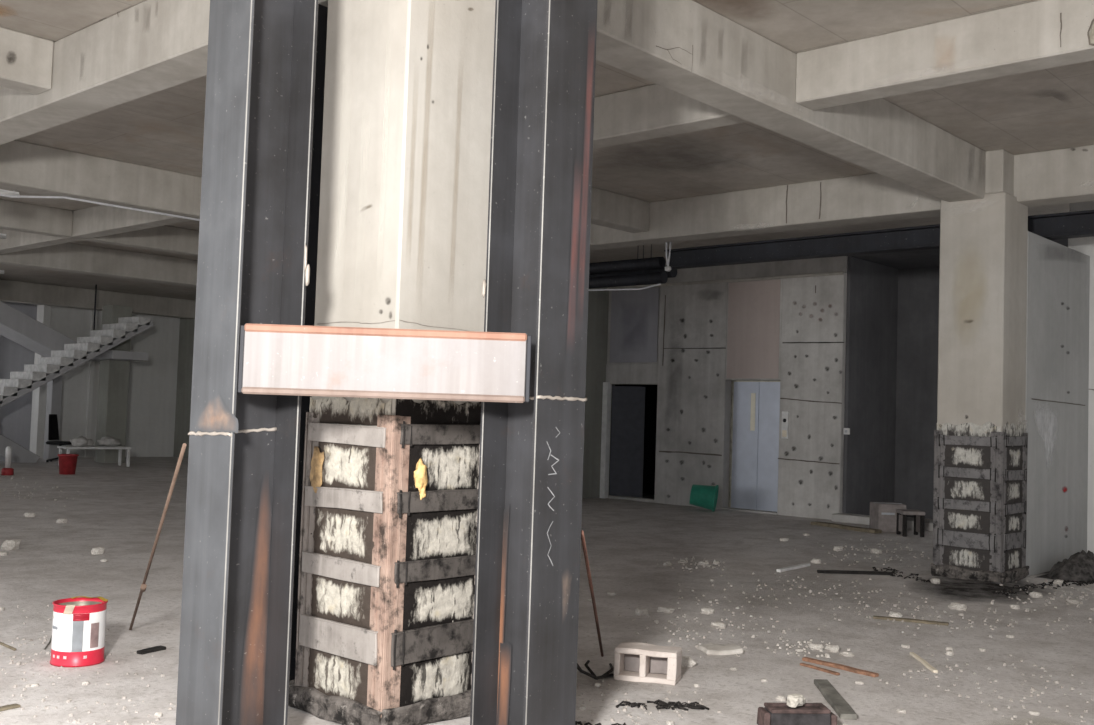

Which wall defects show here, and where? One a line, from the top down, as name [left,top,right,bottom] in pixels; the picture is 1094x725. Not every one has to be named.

rust [566,14,596,358]
rust [238,468,272,725]
rust [496,504,512,725]